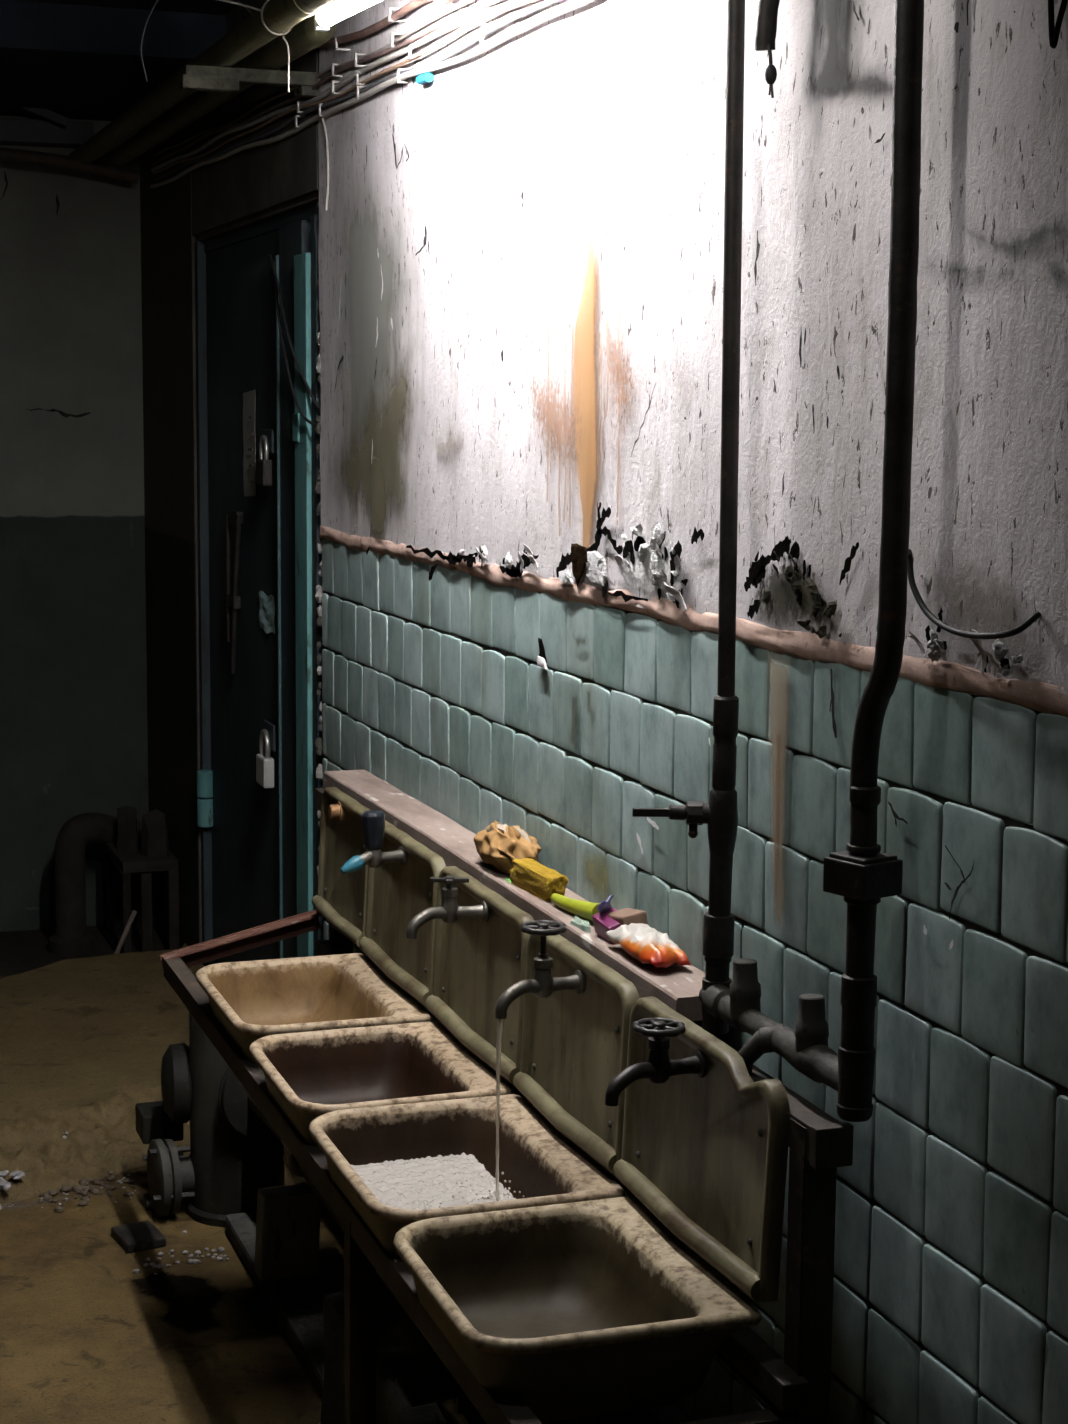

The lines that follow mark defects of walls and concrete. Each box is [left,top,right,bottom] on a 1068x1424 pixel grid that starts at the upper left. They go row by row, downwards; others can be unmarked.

rust [528,221,634,548]
flaking render [406,502,704,611]
flaking render [908,608,948,662]
flaking render [971,630,1023,676]
rust [771,661,787,923]